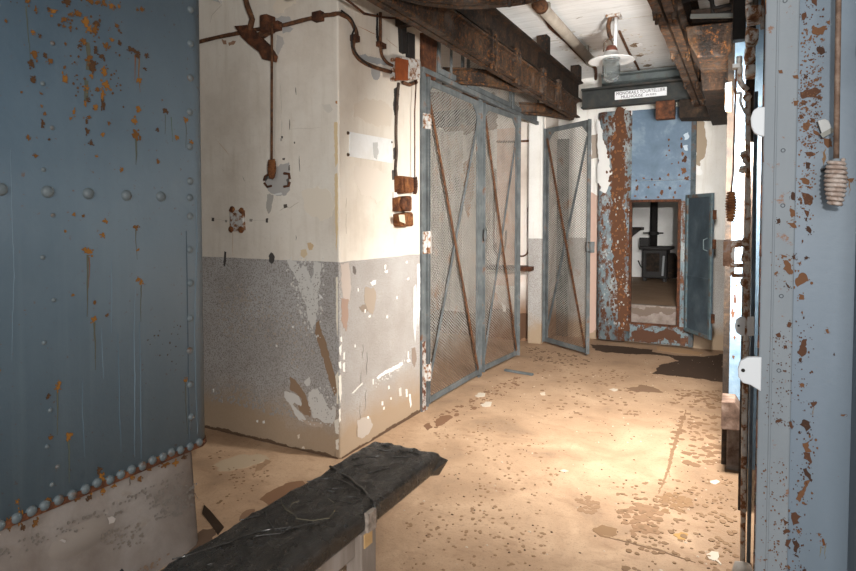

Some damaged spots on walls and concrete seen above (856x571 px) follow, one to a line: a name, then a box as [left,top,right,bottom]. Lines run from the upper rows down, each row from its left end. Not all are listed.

corrosion [81,247,109,370]
peeling [284,262,412,450]
peeling [406,261,420,339]
damp [575,495,601,515]
damp [537,364,663,418]
corrosion [606,107,689,343]
damp [591,344,739,571]
corrosion [770,252,813,301]
corrosion [760,311,827,571]